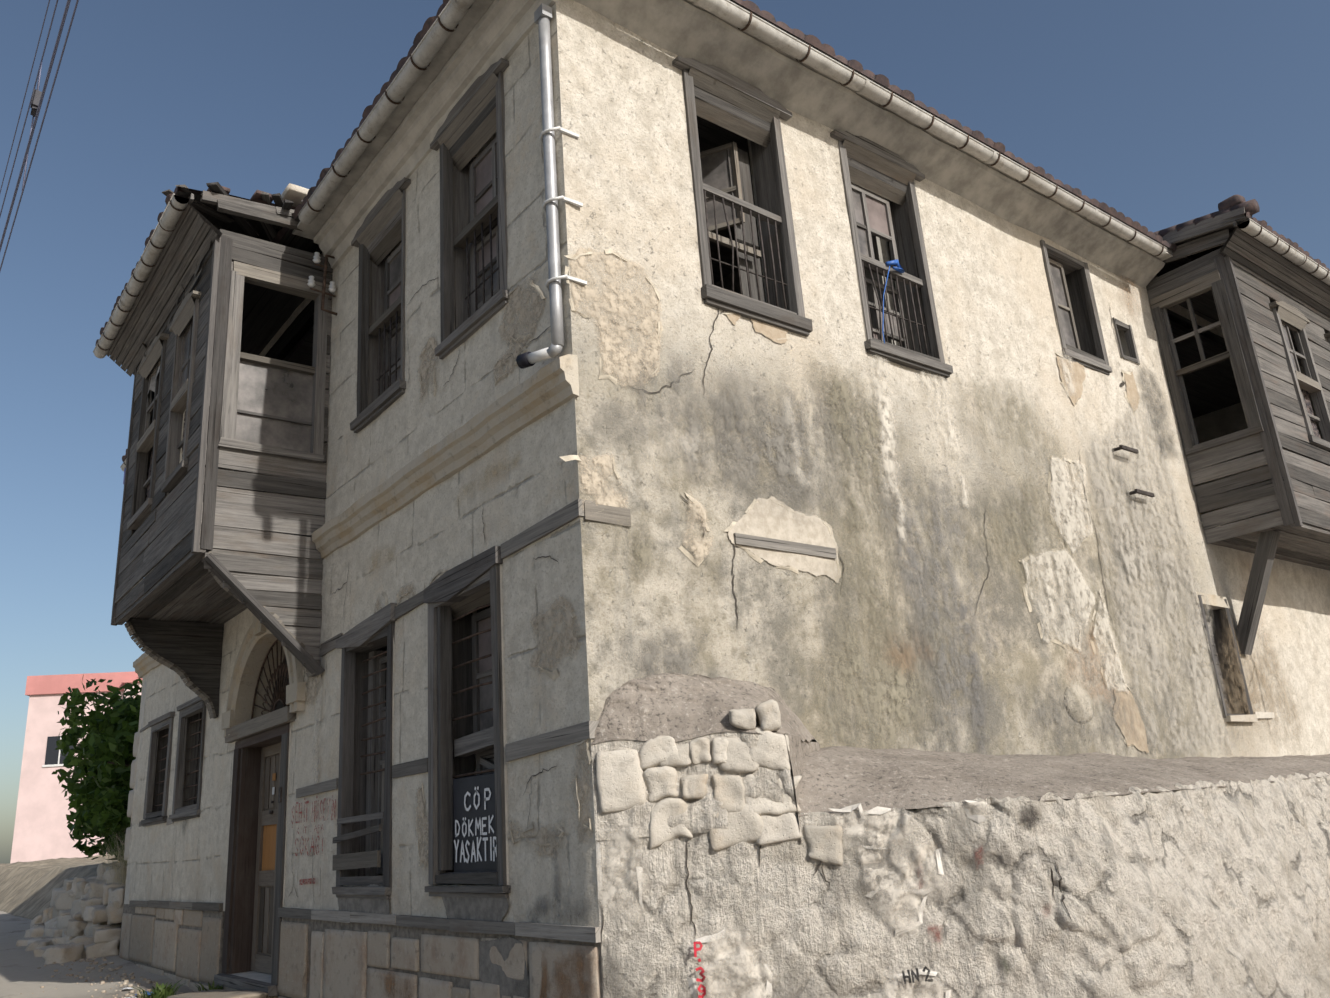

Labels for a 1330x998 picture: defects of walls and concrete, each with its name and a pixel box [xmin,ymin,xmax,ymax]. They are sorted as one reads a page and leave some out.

flaking render [565,248,663,386]
crack [633,309,724,394]
damp [1142,370,1174,457]
flaking render [679,493,841,583]
damp [680,356,982,723]
flaking render [1018,457,1149,753]
damp [824,626,921,750]
crack [685,841,696,941]